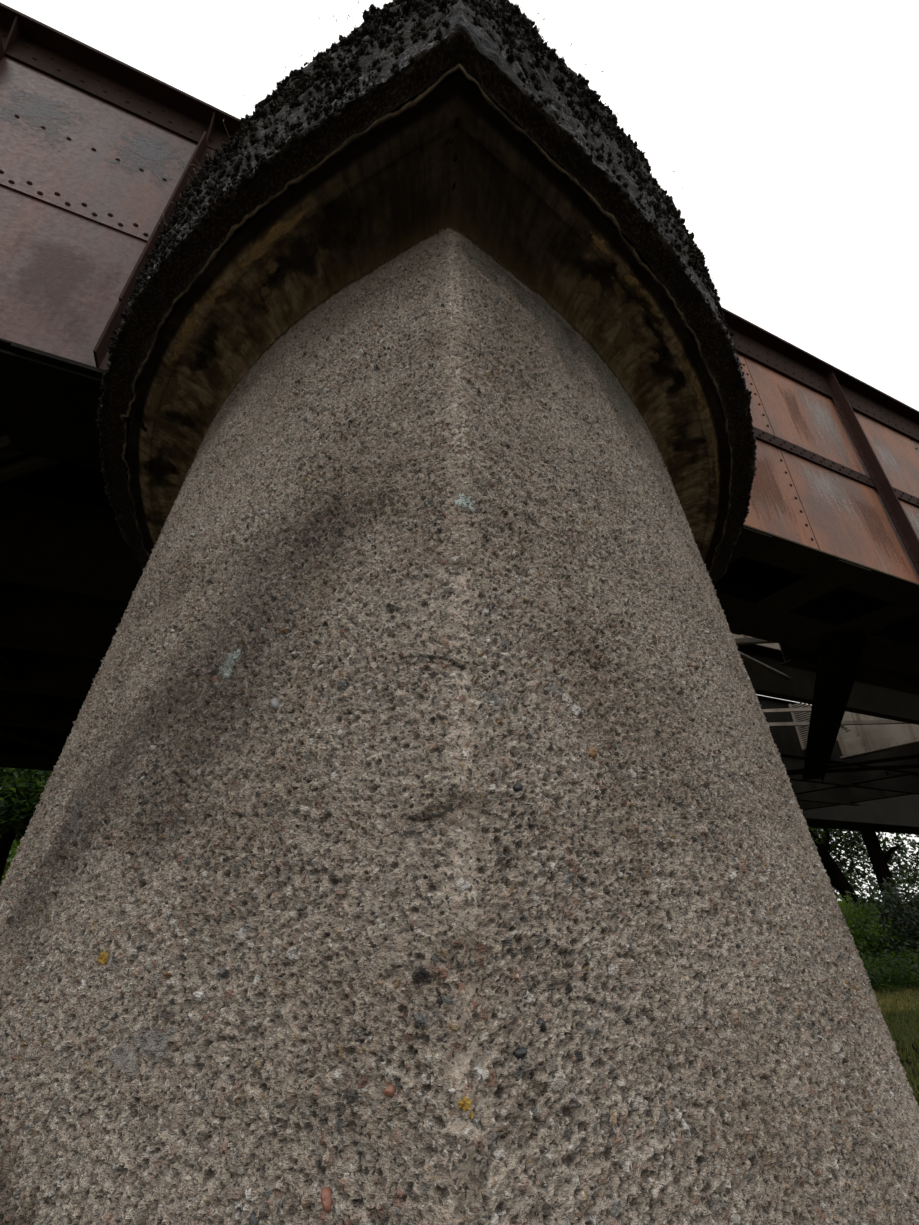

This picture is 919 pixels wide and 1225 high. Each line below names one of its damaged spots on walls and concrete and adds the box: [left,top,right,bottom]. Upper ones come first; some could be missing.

rust [751,456,797,522]